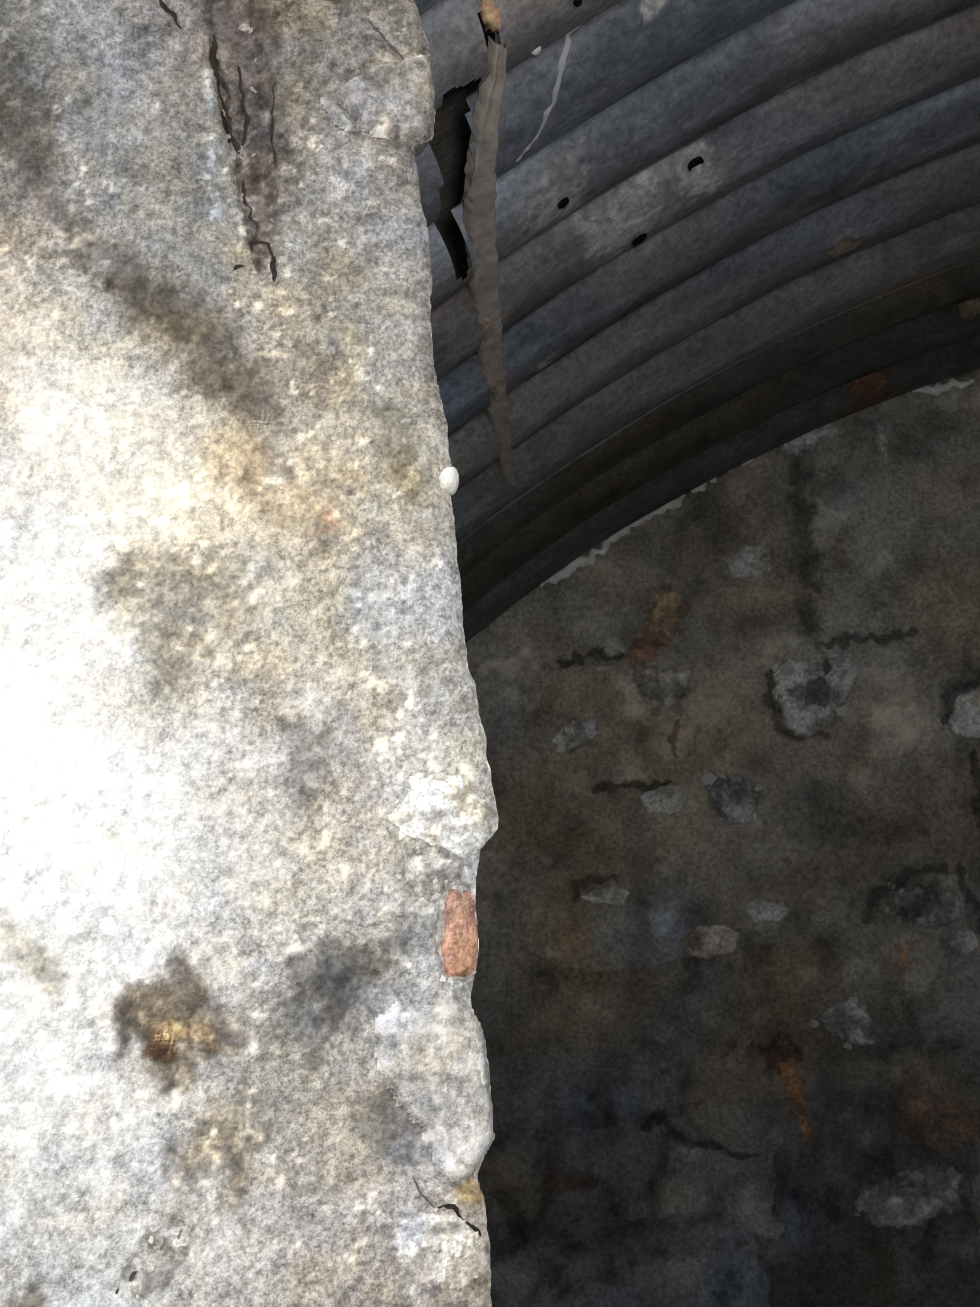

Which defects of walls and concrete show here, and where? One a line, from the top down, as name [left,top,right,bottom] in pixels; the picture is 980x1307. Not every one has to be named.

damp [204,70,218,221]
crack [159,0,277,282]
rust [627,590,682,663]
flaking render [770,648,859,738]
flaking render [949,689,980,738]
flaking render [700,773,763,828]
rust [750,1032,813,1138]
flaking render [853,1164,962,1229]